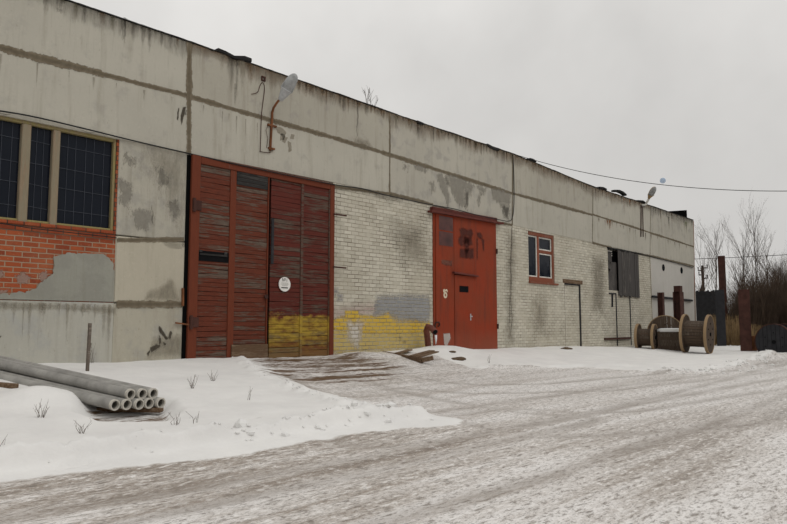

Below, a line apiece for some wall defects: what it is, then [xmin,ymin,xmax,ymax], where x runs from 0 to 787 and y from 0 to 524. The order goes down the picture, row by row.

spalling [0,223,116,295]